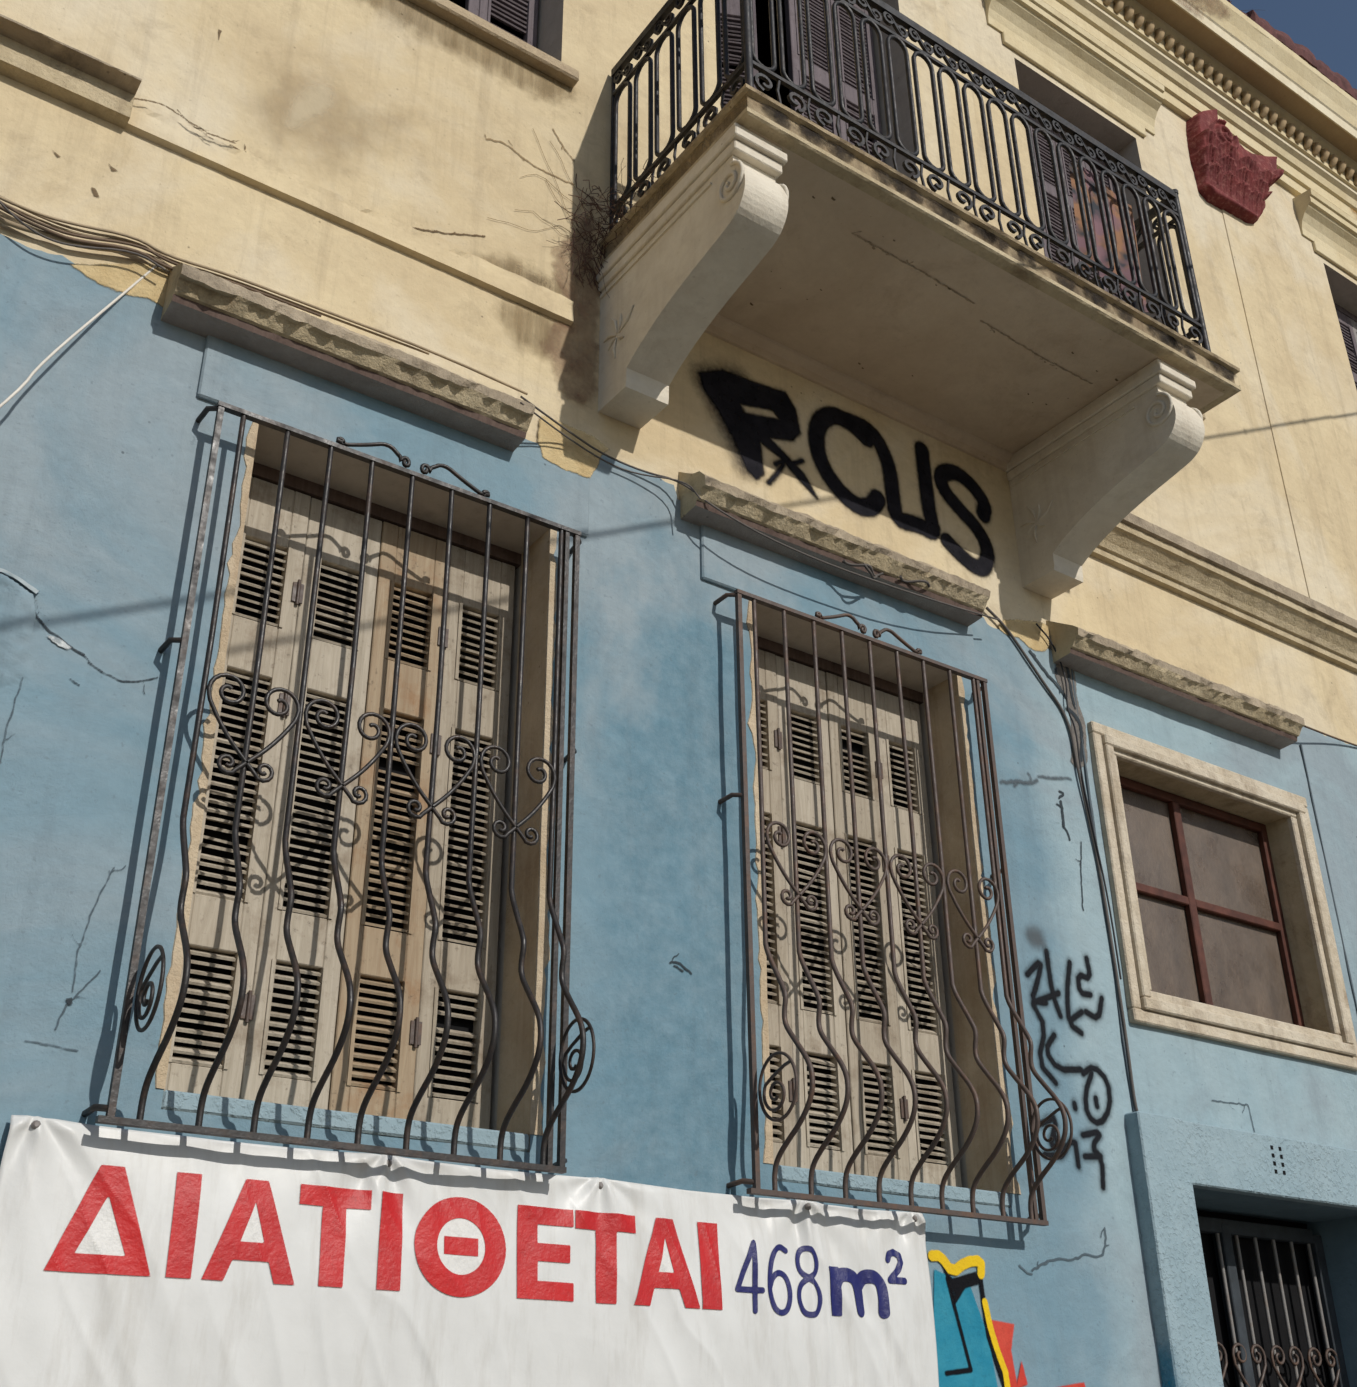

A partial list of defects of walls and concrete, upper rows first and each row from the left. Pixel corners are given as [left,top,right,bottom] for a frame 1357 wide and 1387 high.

crack [134,98,246,152]
crack [413,227,485,237]
peeling [72,263,169,307]
water stain [490,262,522,276]
peeling [538,416,609,478]
crack [36,614,158,694]
crack [0,688,20,762]
crack [25,865,126,1051]